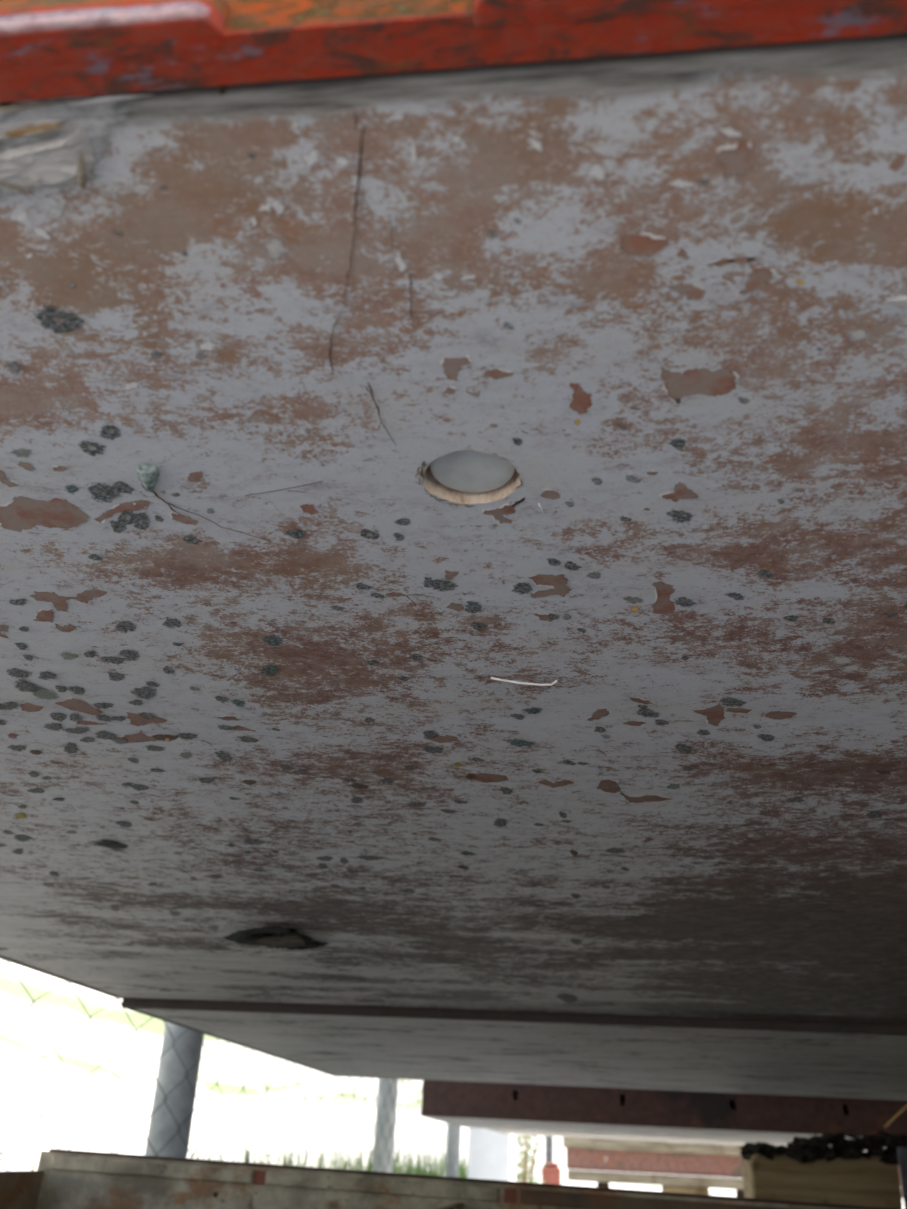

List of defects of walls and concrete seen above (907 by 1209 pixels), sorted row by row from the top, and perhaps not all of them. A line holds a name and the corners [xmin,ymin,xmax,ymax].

spalling [0,93,154,201]
crack [329,111,393,373]
crack [366,383,396,445]
peeling [661,368,740,405]
peeling [0,461,151,532]
spalling [223,927,326,950]